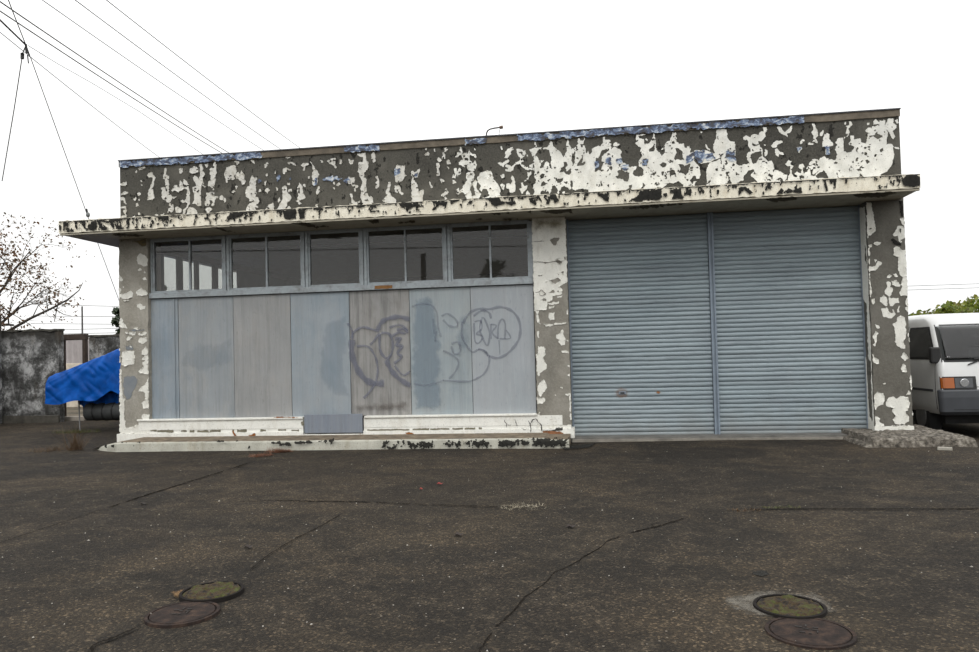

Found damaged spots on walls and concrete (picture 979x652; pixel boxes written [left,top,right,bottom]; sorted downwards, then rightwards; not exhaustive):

peeling [119,116,899,218]
peeling [118,253,247,434]
peeling [532,217,572,434]
peeling [859,200,913,426]